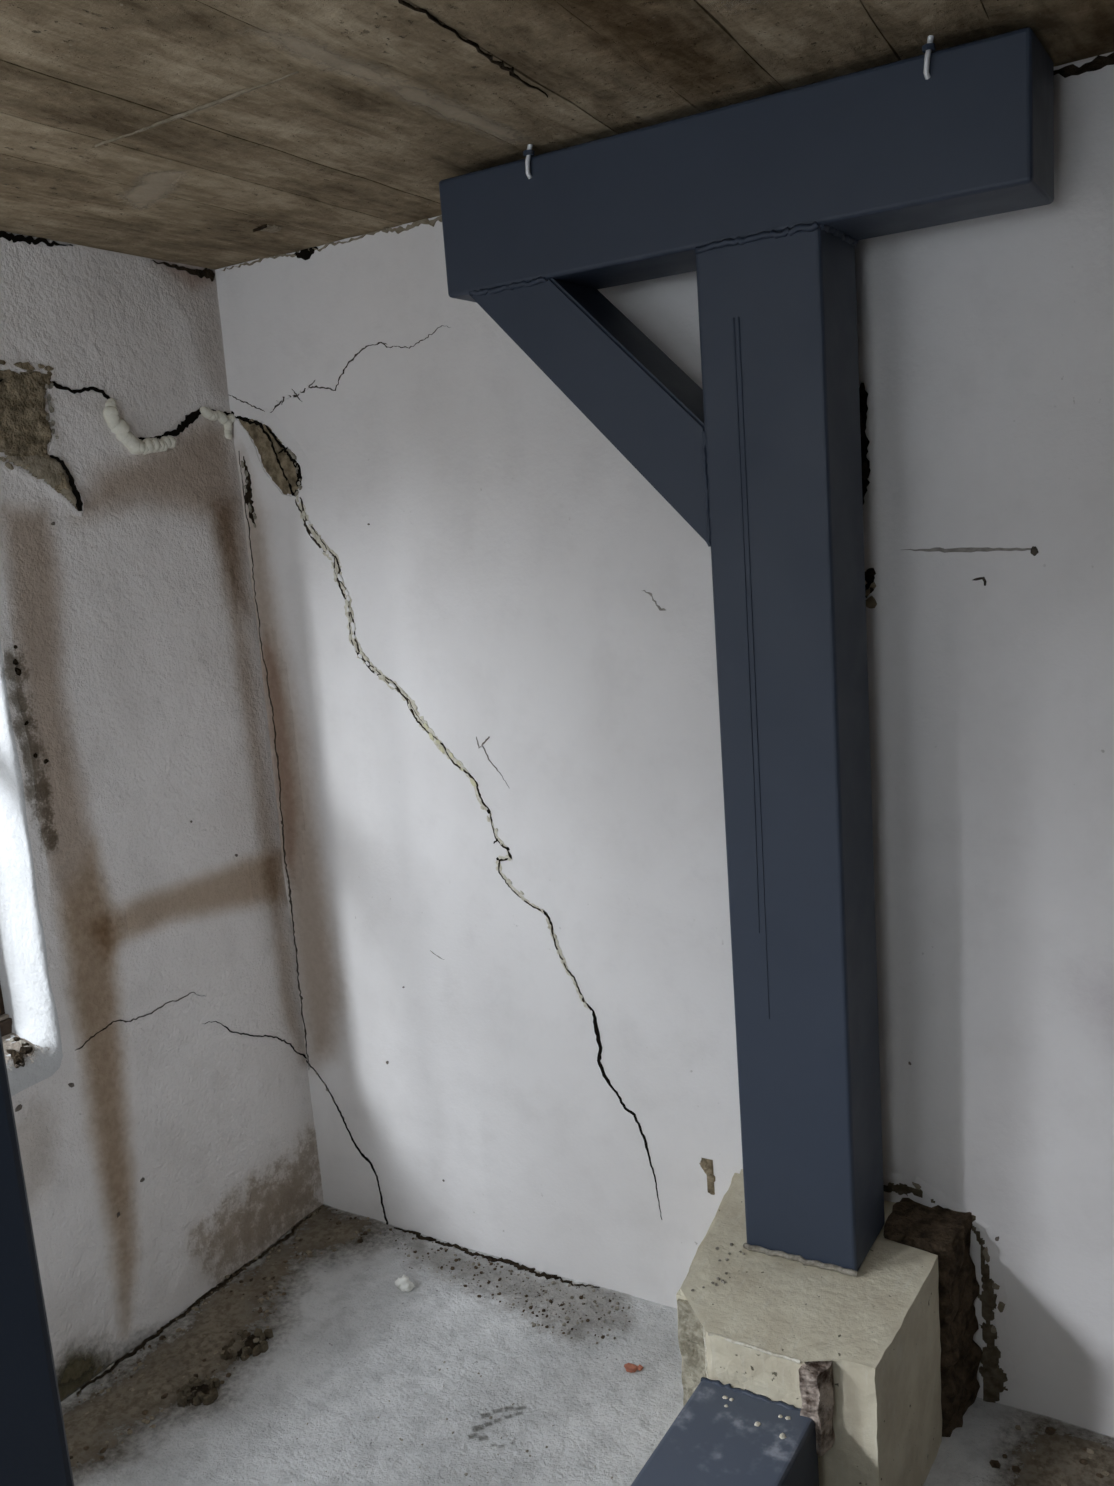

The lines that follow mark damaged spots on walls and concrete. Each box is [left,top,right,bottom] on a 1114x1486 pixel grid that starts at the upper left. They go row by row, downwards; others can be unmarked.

spalling [0,360,85,525]
crack [50,381,110,400]
spalling [232,402,313,528]
crack [139,325,450,440]
spalling [859,383,871,504]
spalling [865,568,877,609]
crack [75,455,600,1288]
crack [294,489,662,1219]
spalling [883,1172,1017,1403]
water stain [56,1350,127,1402]